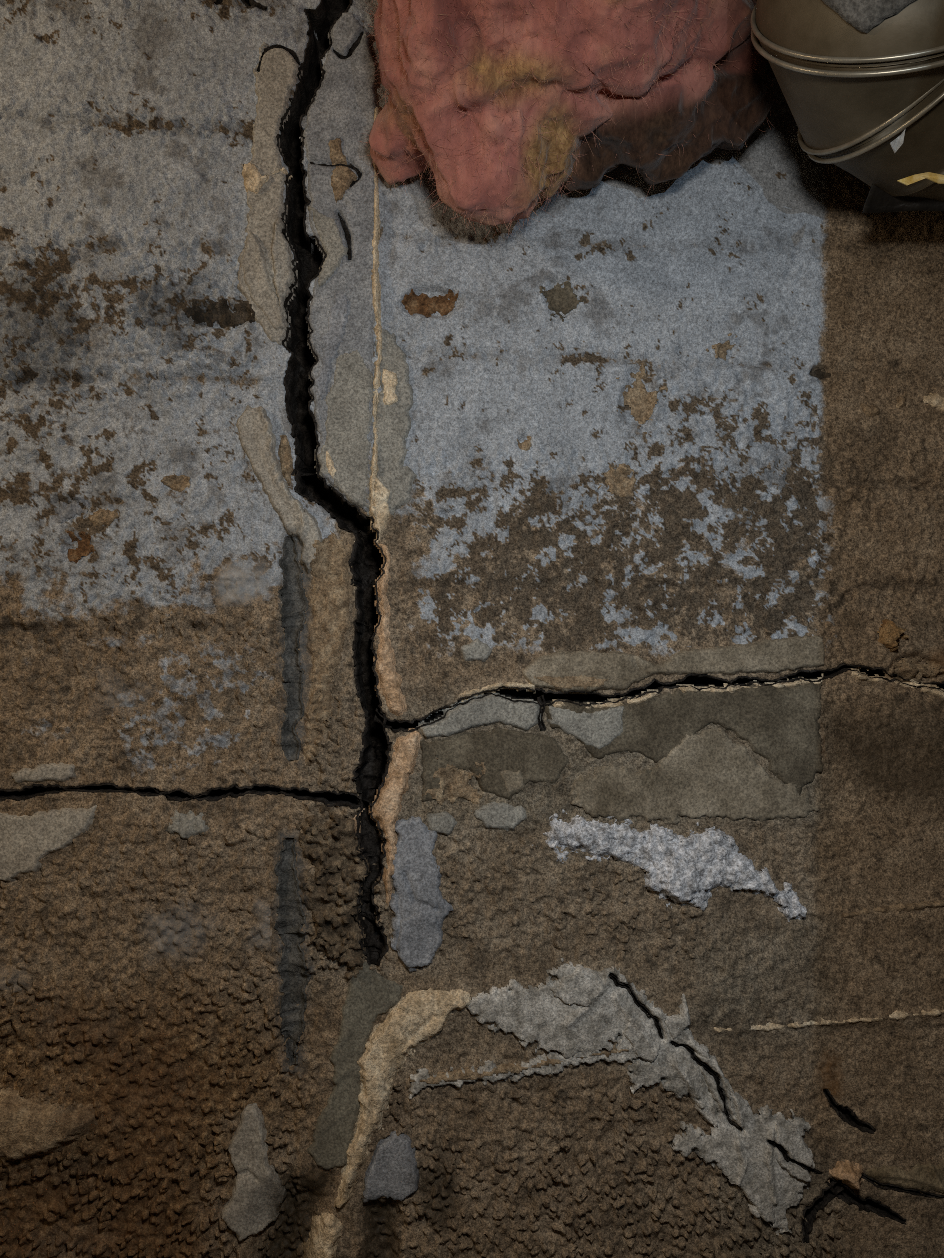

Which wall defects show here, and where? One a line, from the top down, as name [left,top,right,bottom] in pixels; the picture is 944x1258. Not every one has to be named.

flaking render [183,42,303,346]
flaking render [299,13,417,540]
crack [0,0,944,966]
spalling [517,436,532,451]
spalling [598,463,637,497]
crack [274,836,311,1072]
flaking render [295,634,825,1170]
flaking render [363,1131,420,1203]
flaking render [408,958,815,1235]
crack [609,973,944,1243]